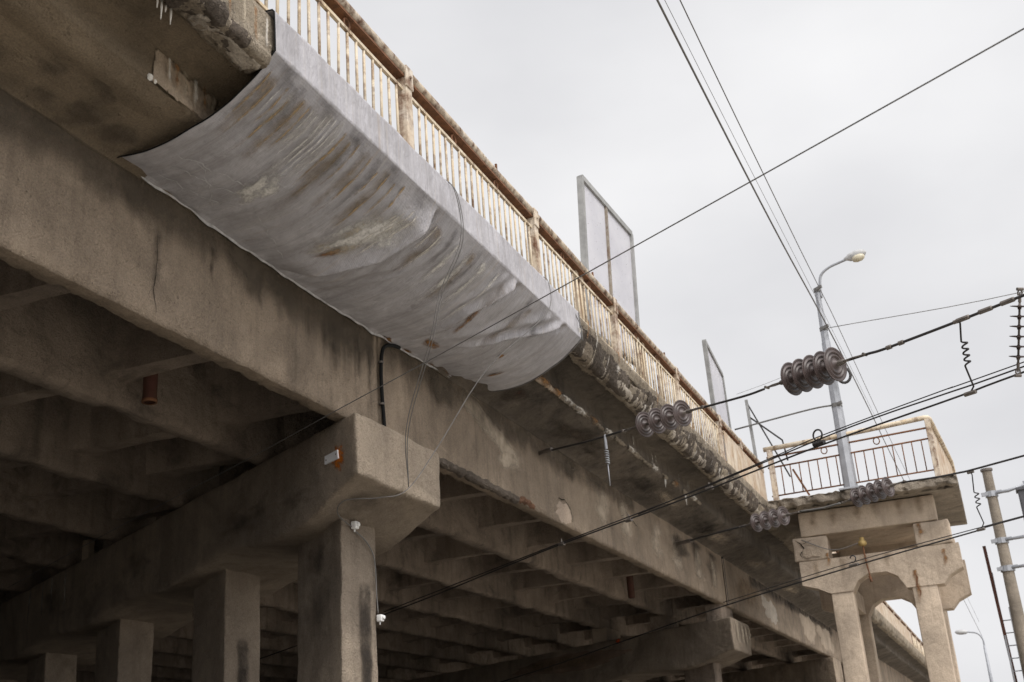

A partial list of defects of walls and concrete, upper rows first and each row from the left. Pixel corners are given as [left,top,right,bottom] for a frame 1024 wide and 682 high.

spalling [164,0,272,74]
rust [295,134,405,221]
water stain [0,88,633,535]
spalling [568,321,672,416]
spalling [439,458,535,509]
peeling [556,498,573,524]
spalling [558,394,702,505]